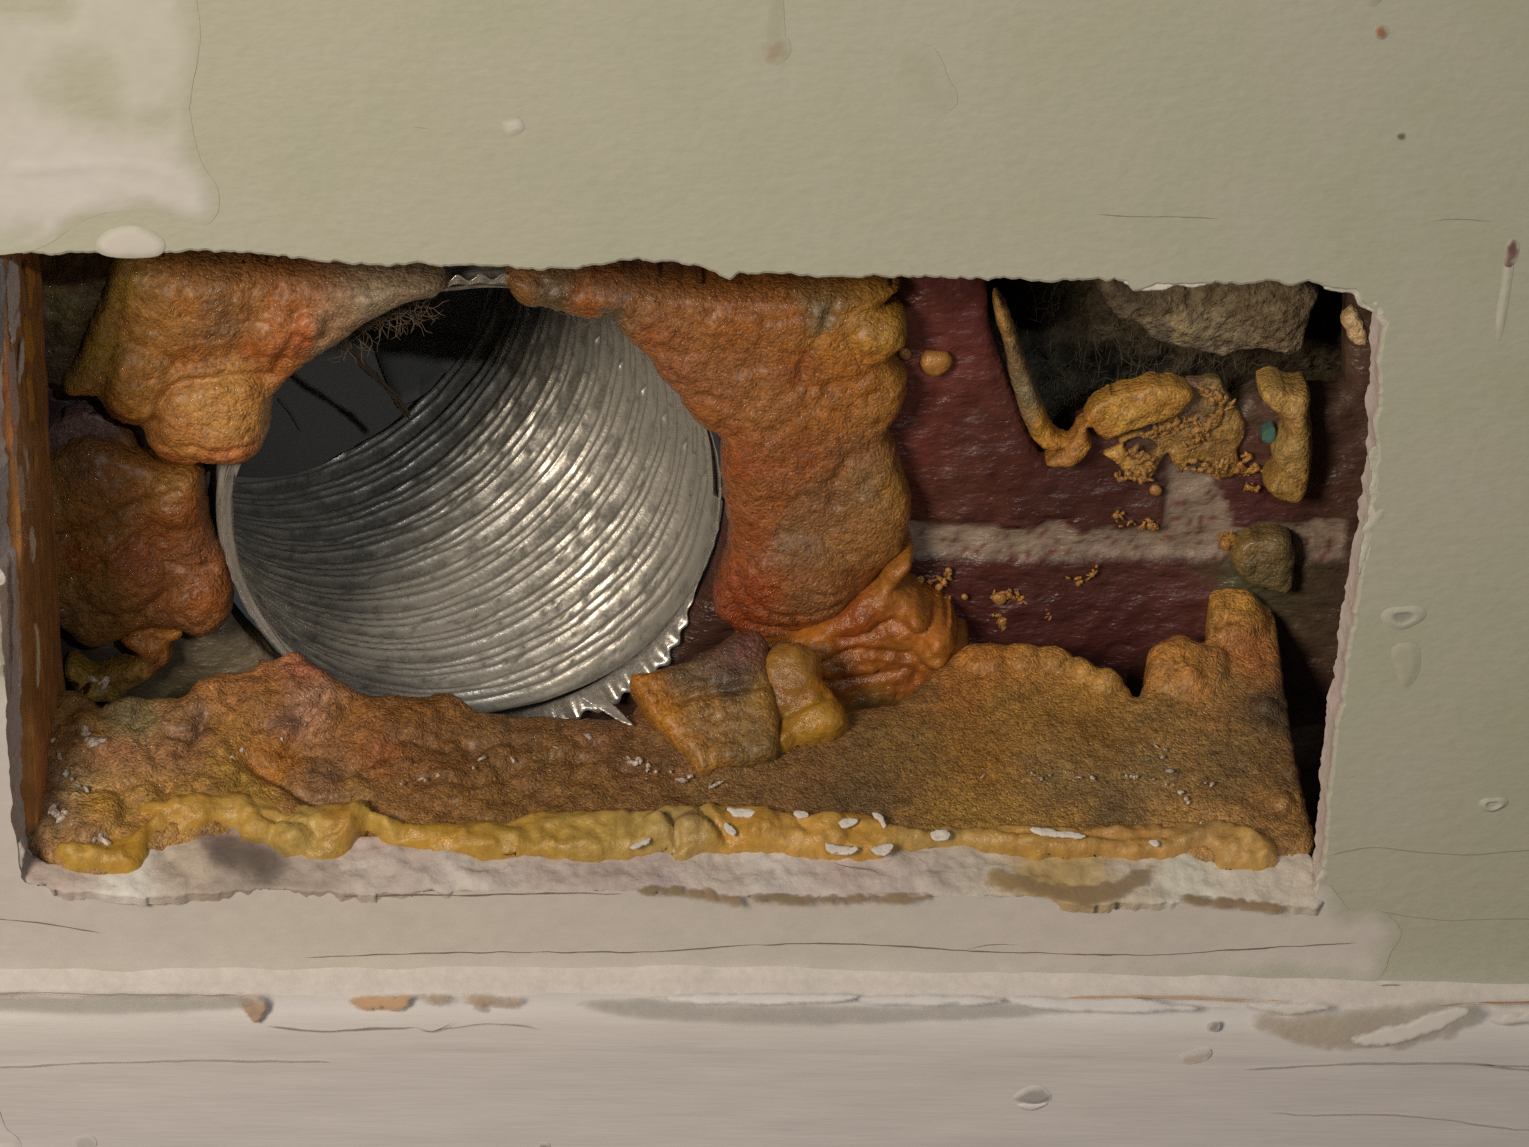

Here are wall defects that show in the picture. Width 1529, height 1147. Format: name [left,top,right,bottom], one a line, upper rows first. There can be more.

crack [0,919,98,933]
crack [304,943,1349,958]
peeling [239,995,267,1023]
peeling [351,994,445,1011]
peeling [465,995,521,1012]
peeling [667,993,1197,1013]
peeling [1250,1003,1529,1047]